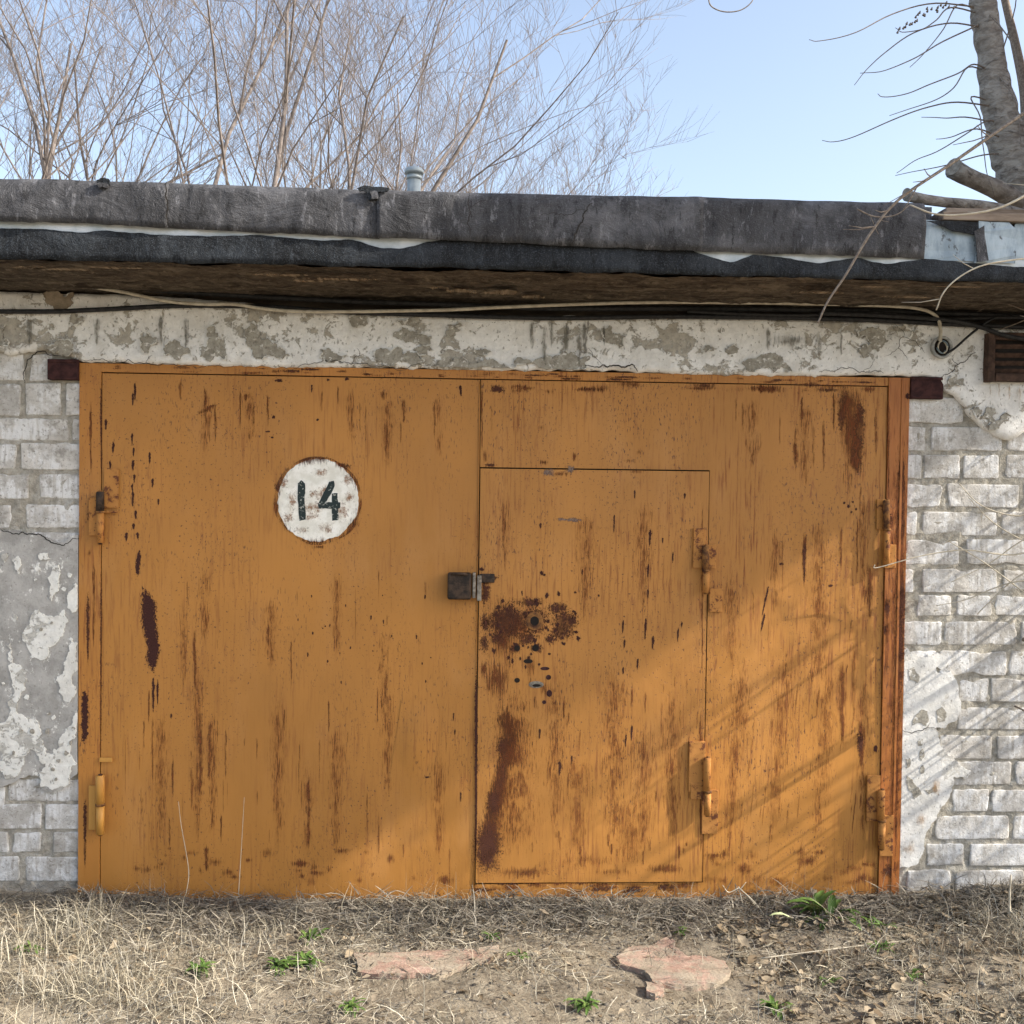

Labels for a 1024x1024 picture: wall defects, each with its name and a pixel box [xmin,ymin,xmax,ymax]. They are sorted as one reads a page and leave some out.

peeling [139,324,227,362]
peeling [244,323,290,359]
peeling [373,317,590,370]
rust [481,373,659,467]
peeling [703,343,793,373]
flaking render [0,529,79,793]
crack [2,530,79,546]
rust [124,433,174,849]
rust [180,578,242,878]
rust [472,490,703,893]
rust [739,379,907,841]
flaking render [900,647,971,868]